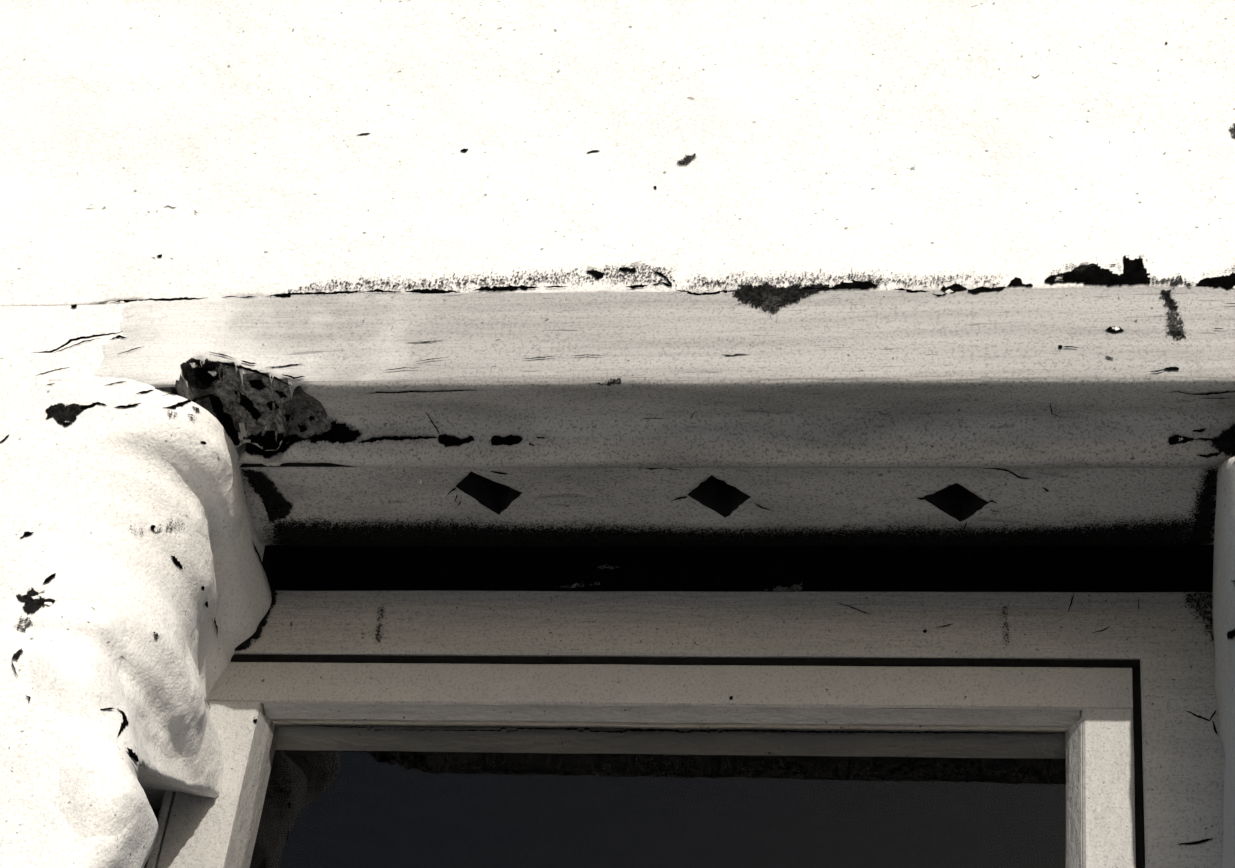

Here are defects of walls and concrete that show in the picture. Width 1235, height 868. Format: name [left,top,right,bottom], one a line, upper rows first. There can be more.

spalling [798,272,885,292]
spalling [932,254,1154,297]
spalling [1196,263,1235,290]
spalling [191,363,220,388]
spalling [248,379,315,432]
spalling [14,573,56,631]